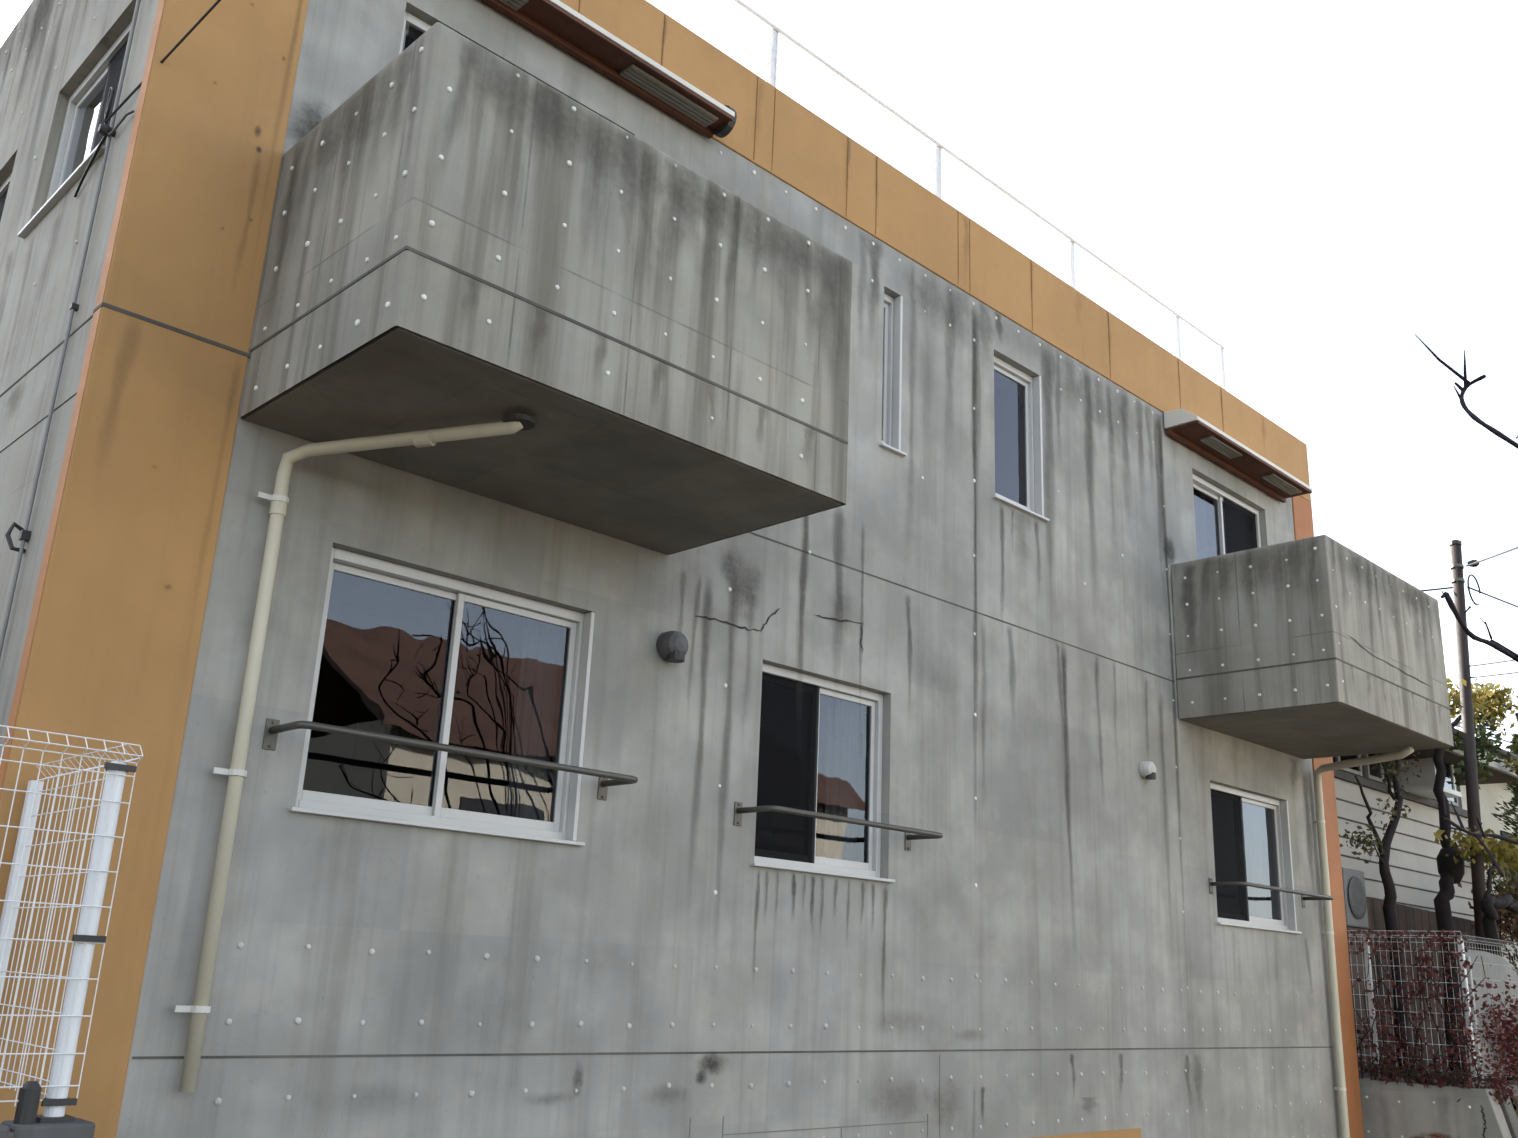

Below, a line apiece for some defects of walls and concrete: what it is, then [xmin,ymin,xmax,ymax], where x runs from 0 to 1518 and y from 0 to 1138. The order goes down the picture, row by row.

leakage [1160,439,1176,731]